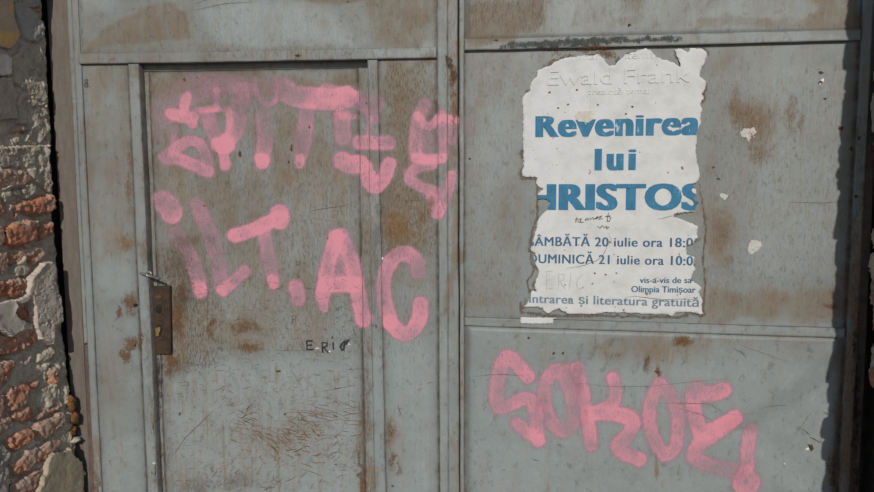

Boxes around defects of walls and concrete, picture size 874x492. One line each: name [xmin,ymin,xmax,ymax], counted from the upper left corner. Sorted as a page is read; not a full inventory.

peeling [0,0,22,50]
peeling [0,261,64,410]
rust [119,333,143,361]
peeling [33,447,86,492]